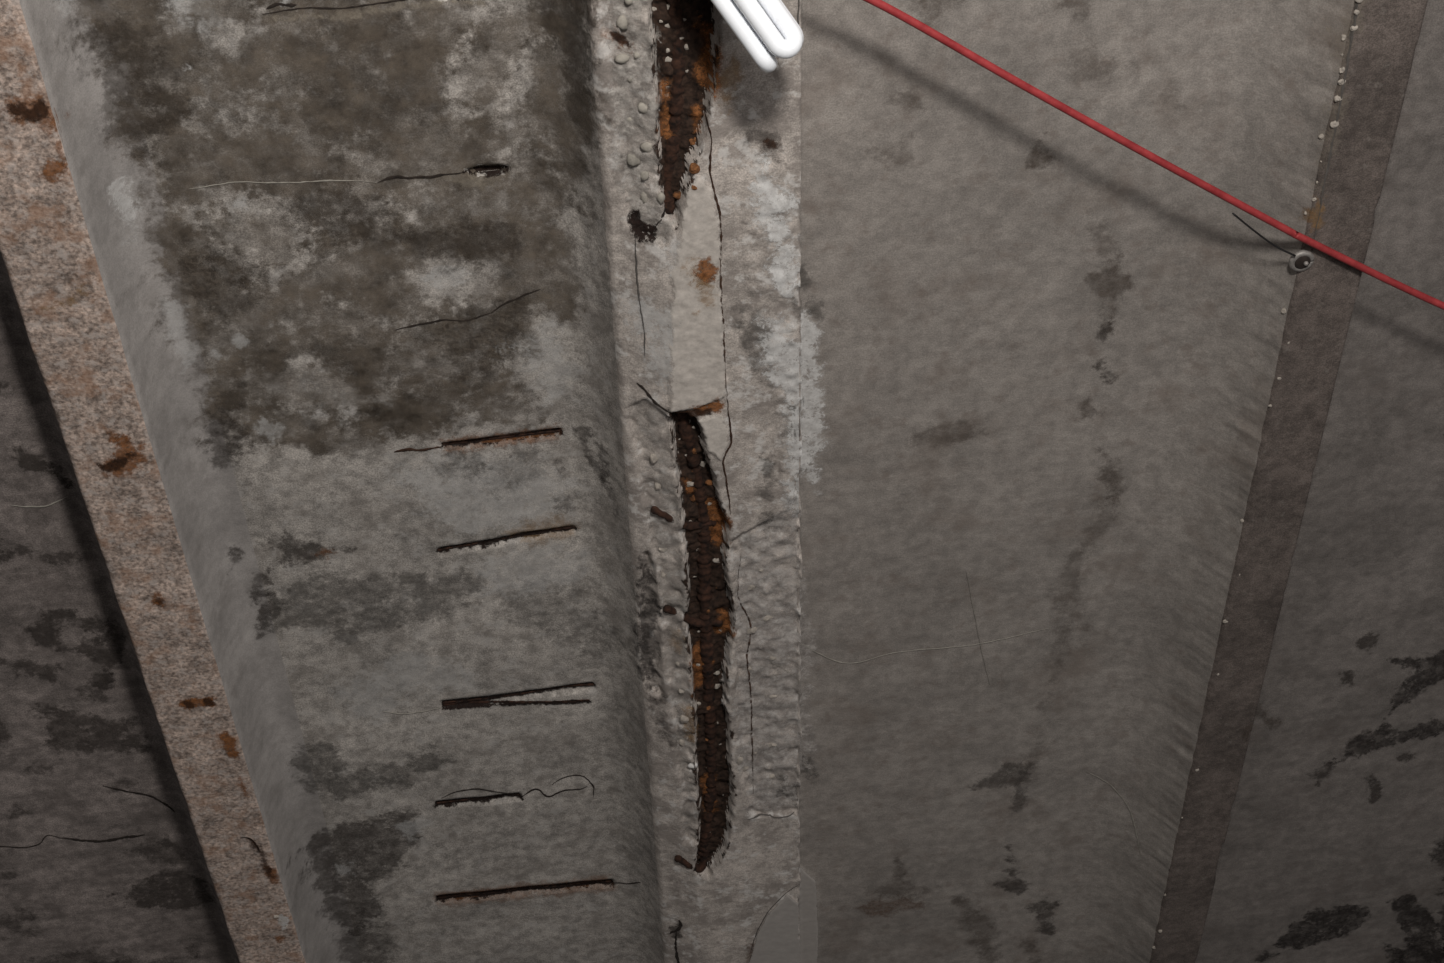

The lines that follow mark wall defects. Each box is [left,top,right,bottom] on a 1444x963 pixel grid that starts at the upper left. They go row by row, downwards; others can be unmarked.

rust [610,32,632,47]
rust [7,97,58,127]
leakage [69,0,611,455]
leakage [11,446,73,508]
rust [97,432,147,477]
spalling [608,0,748,876]
rust [671,400,724,417]
leakage [251,536,478,643]
leakage [0,609,149,753]
leakage [1316,650,1444,787]
leakage [302,811,419,935]
leakage [1256,904,1369,962]